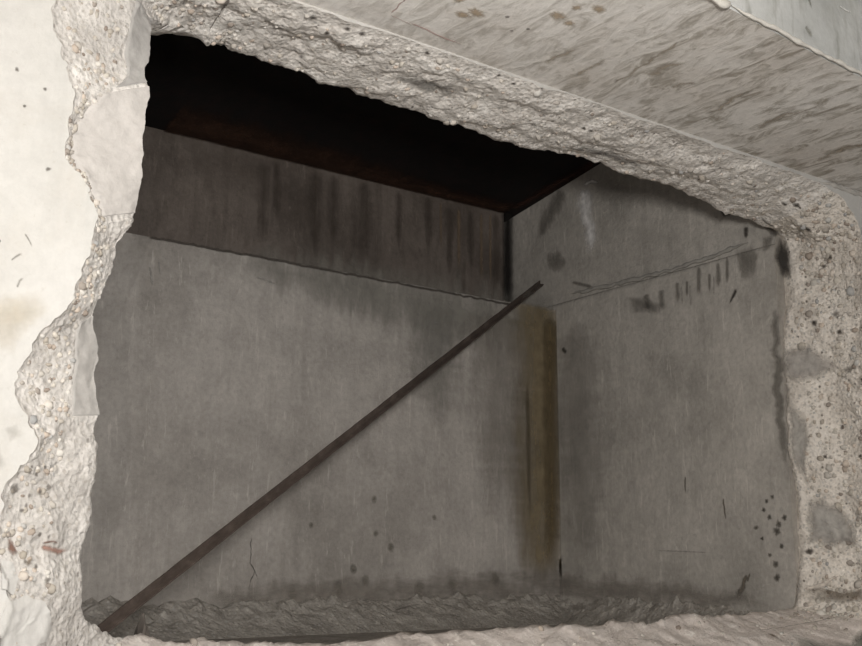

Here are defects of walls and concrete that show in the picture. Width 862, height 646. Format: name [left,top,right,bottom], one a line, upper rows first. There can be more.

spalling [51,0,831,309]
spalling [0,301,862,646]
leakage [309,213,757,605]
spalling [764,191,862,618]